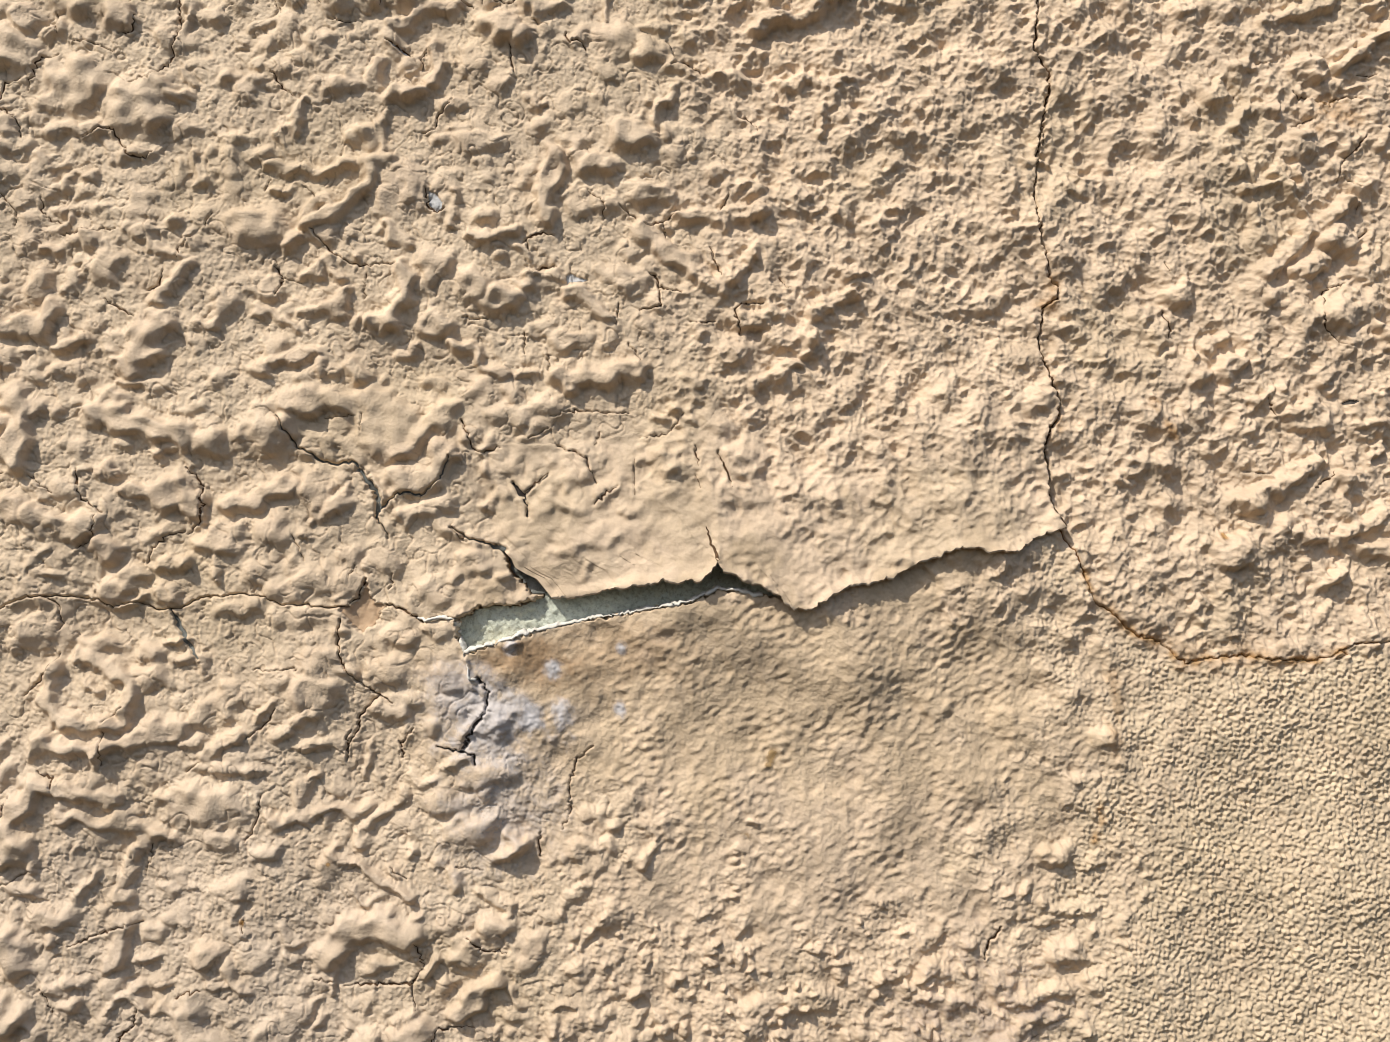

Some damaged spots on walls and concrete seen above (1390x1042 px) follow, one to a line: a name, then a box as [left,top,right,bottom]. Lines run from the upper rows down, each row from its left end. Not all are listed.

crack [1033,0,1390,664]
crack [0,469,102,548]
crack [148,468,206,563]
crack [448,527,506,553]
crack [277,409,733,534]
flaking render [417,380,1067,681]
crack [1,565,455,756]
efflorescence [545,661,559,679]
crack [400,678,490,765]
efflorescence [438,672,570,769]